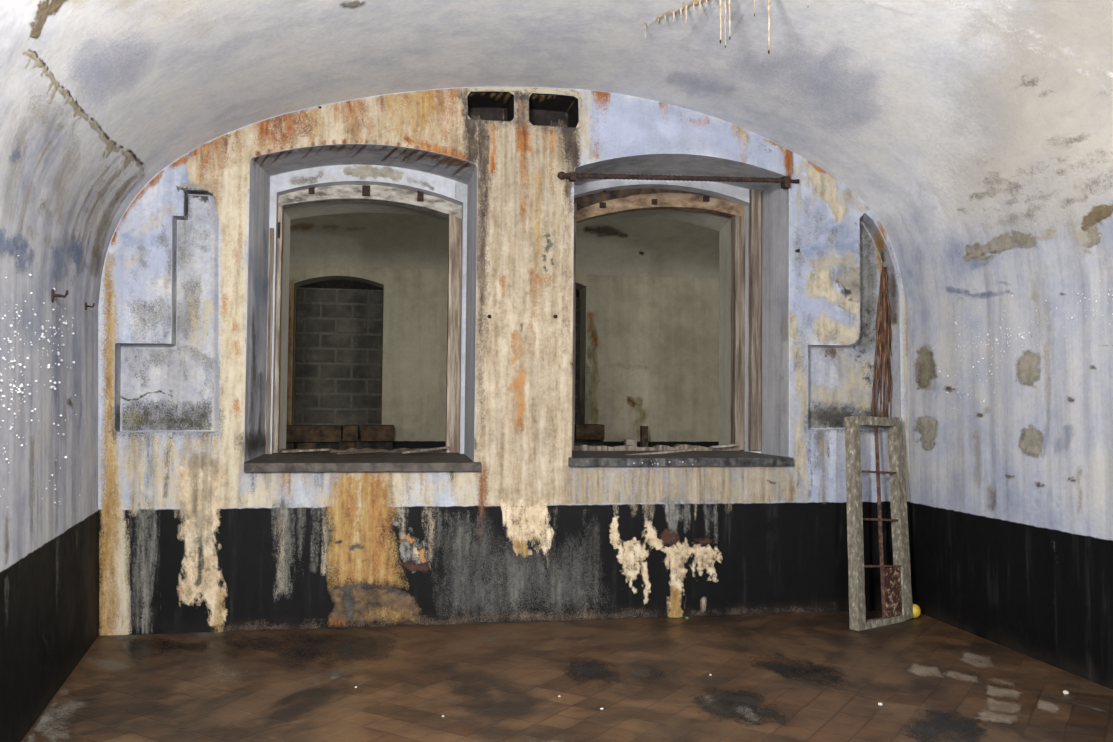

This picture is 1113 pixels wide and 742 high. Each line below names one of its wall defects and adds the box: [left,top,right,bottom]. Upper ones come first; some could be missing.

spalling [28,0,85,40]
rust [111,88,611,247]
damp [912,0,1113,270]
peeling [958,134,1113,270]
damp [0,0,909,690]
rust [506,321,538,434]
spalling [915,345,955,392]
damp [947,281,1013,299]
spalling [1019,424,1044,457]
rust [320,471,409,589]